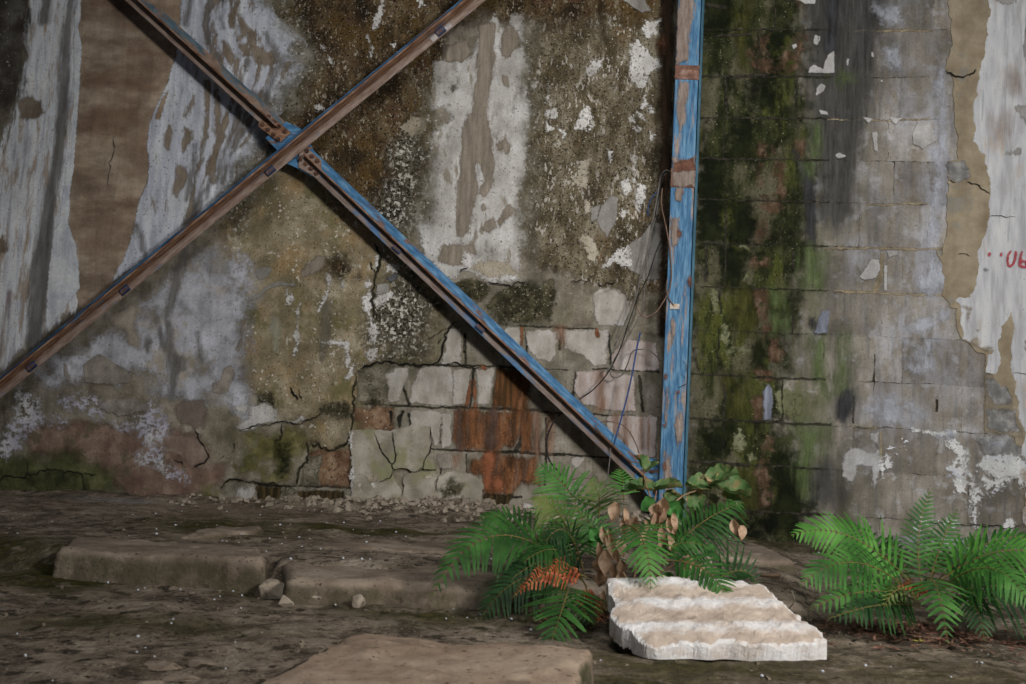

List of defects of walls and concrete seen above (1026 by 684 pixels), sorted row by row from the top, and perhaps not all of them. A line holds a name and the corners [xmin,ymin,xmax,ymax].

water stain [0,390,225,496]
peeling [0,0,269,373]
peeling [151,0,333,115]
crack [175,322,479,488]
water stain [211,164,447,499]
water stain [204,0,460,130]
peeling [365,0,385,58]
water stain [311,0,674,326]
corrosion [452,365,553,496]
corrosion [657,0,696,343]
water stain [792,0,903,289]
peeling [936,0,1026,461]